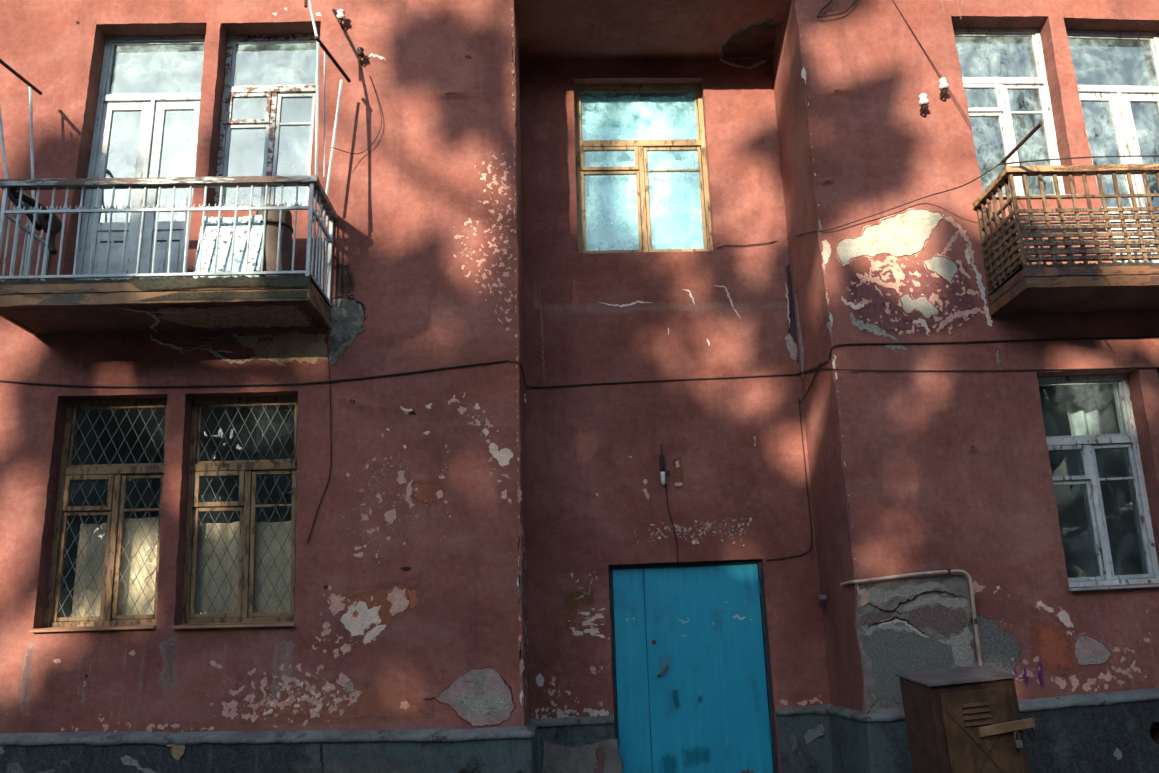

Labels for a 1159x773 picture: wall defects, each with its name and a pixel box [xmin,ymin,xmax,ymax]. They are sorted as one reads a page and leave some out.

spalling [719,19,782,69]
peeling [453,127,518,368]
peeling [818,204,993,350]
crack [108,306,285,366]
spalling [303,294,368,366]
peeling [61,393,610,761]
crack [863,590,968,638]
spalling [853,574,1147,714]
spalling [120,754,157,773]
spalling [540,737,623,773]